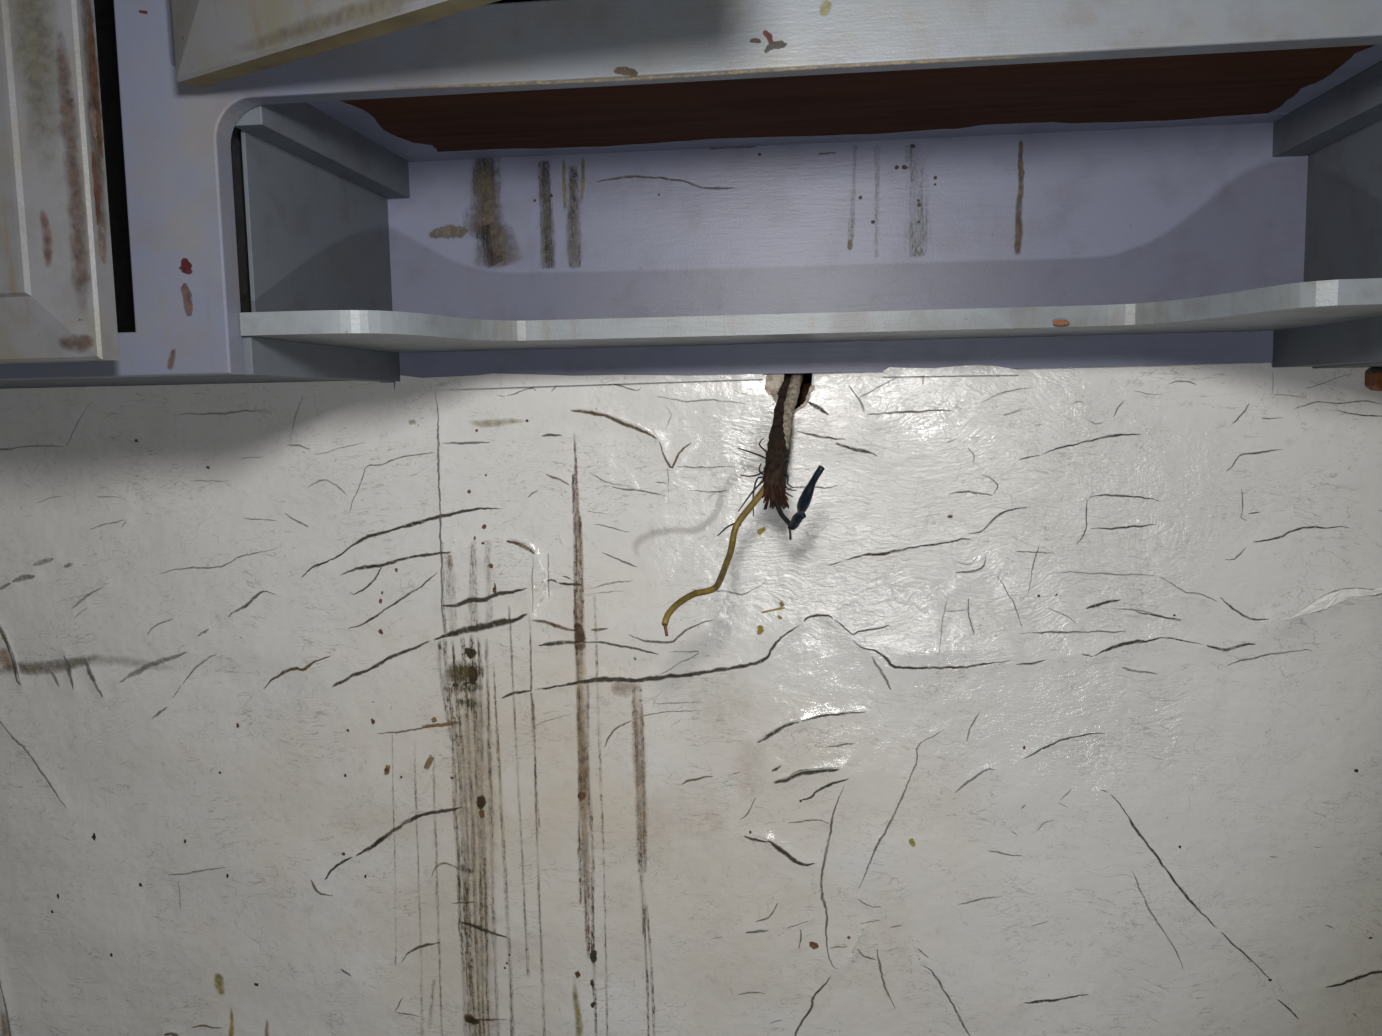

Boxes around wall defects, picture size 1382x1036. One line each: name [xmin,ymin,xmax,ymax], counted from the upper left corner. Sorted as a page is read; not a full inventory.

crack [1226,374,1377,560]
crack [0,591,273,718]
crack [311,807,460,896]
crack [404,863,507,958]
damp [438,591,543,1036]
damp [572,446,608,1036]
damp [632,689,647,867]
crack [265,380,1309,743]
crack [682,712,979,1035]
crack [1026,994,1087,1004]
crack [1103,790,1298,1019]
peeling [1287,587,1382,620]